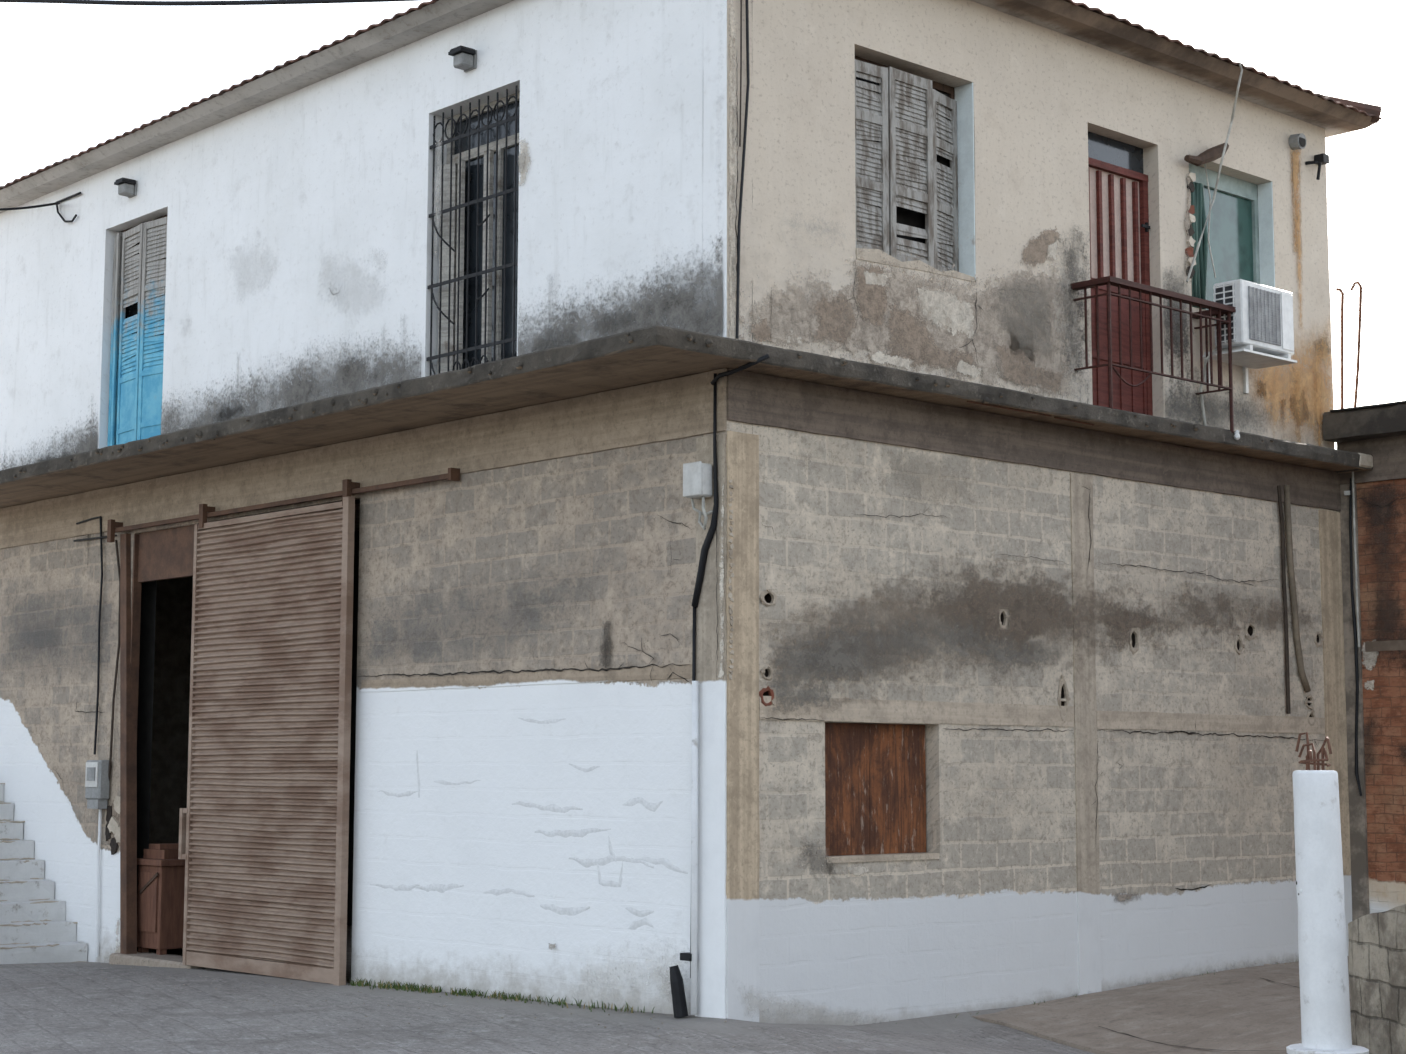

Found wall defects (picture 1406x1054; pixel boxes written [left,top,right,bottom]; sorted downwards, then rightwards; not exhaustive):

flaking render [729,0,1095,426]
damp [518,239,723,356]
damp [161,342,421,435]
corrosion [1250,338,1333,446]
damp [775,579,1072,707]